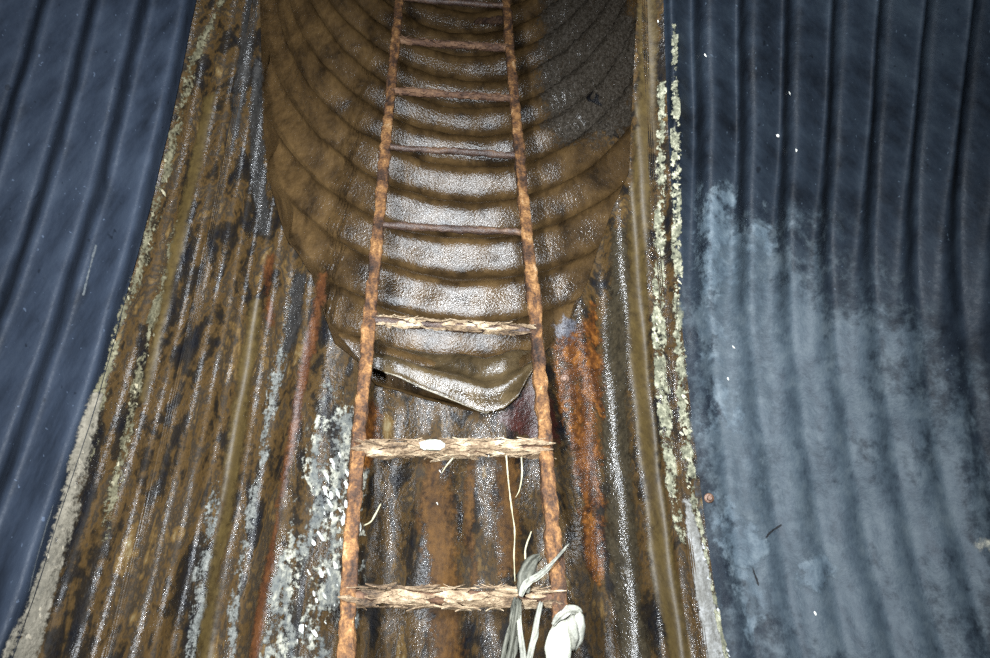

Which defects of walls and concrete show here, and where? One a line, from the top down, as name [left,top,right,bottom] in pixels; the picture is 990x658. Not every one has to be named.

rust [263,254,274,328]
rust [250,272,327,658]
rust [365,401,382,440]
rust [497,382,538,439]
rust [549,301,605,585]
damp [600,0,990,658]